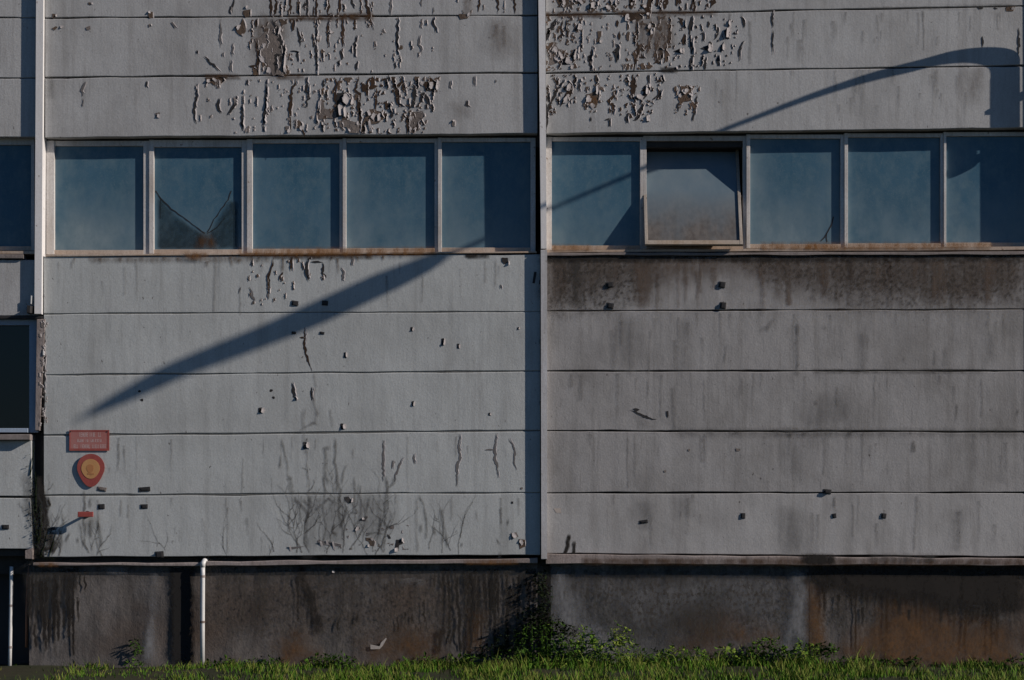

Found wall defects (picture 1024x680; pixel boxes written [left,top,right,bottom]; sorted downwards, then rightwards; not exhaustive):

peeling [195,77,226,101]
peeling [229,0,441,134]
peeling [545,0,739,122]
peeling [248,258,295,305]
damp [547,255,1023,308]
damp [27,568,87,655]